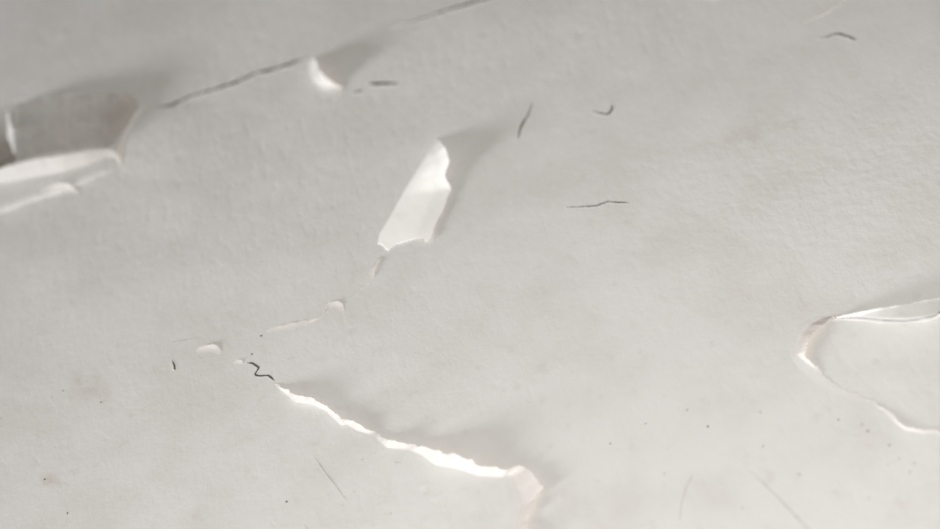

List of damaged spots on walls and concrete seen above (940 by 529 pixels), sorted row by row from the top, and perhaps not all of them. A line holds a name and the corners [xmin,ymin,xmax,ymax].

crack [390,0,496,29]
crack [149,56,315,108]
peeling [308,58,344,101]
peeling [0,93,270,228]
peeling [378,139,451,251]
flaking render [790,297,940,480]
peeling [176,383,544,529]